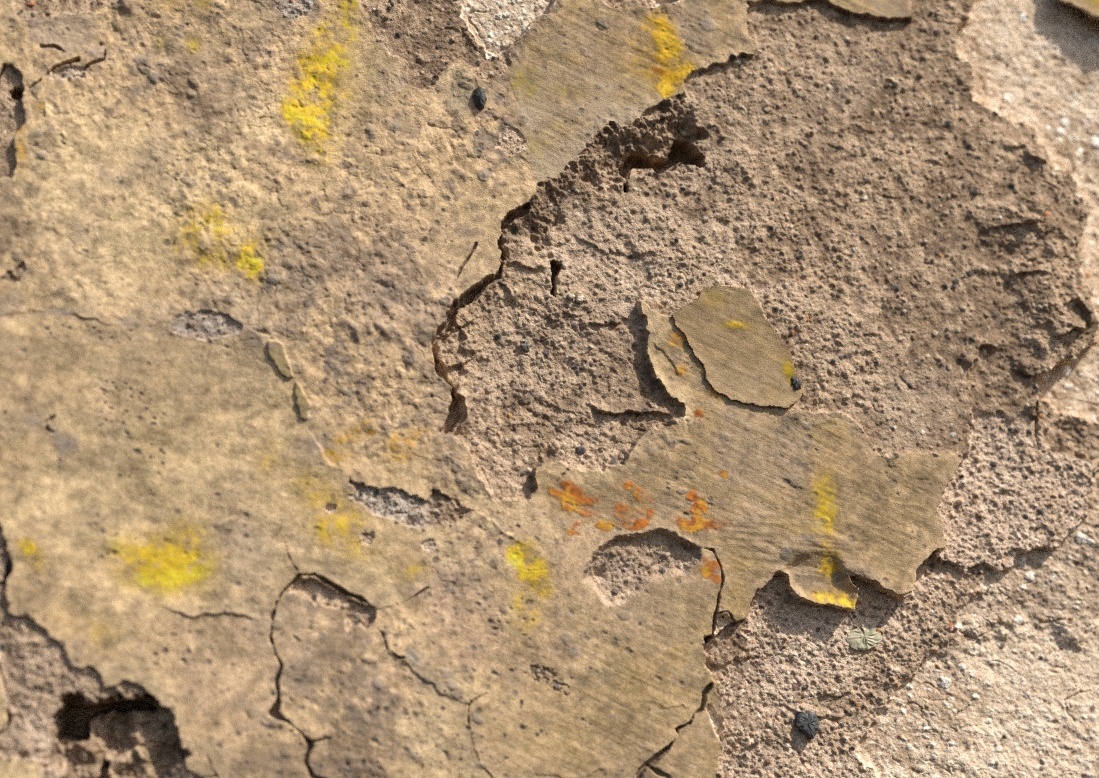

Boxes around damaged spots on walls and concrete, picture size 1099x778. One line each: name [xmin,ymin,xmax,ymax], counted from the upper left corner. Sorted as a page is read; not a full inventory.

flaking render [12,0,122,24]
flaking render [276,0,316,21]
flaking render [50,64,87,81]
flaking render [0,63,26,179]
flaking render [170,309,244,342]
flaking render [348,0,1099,778]
flaking render [324,502,338,515]
flaking render [0,524,202,778]
crack [269,543,370,778]
crack [382,633,405,660]
crack [467,693,492,778]
crack [636,683,714,778]